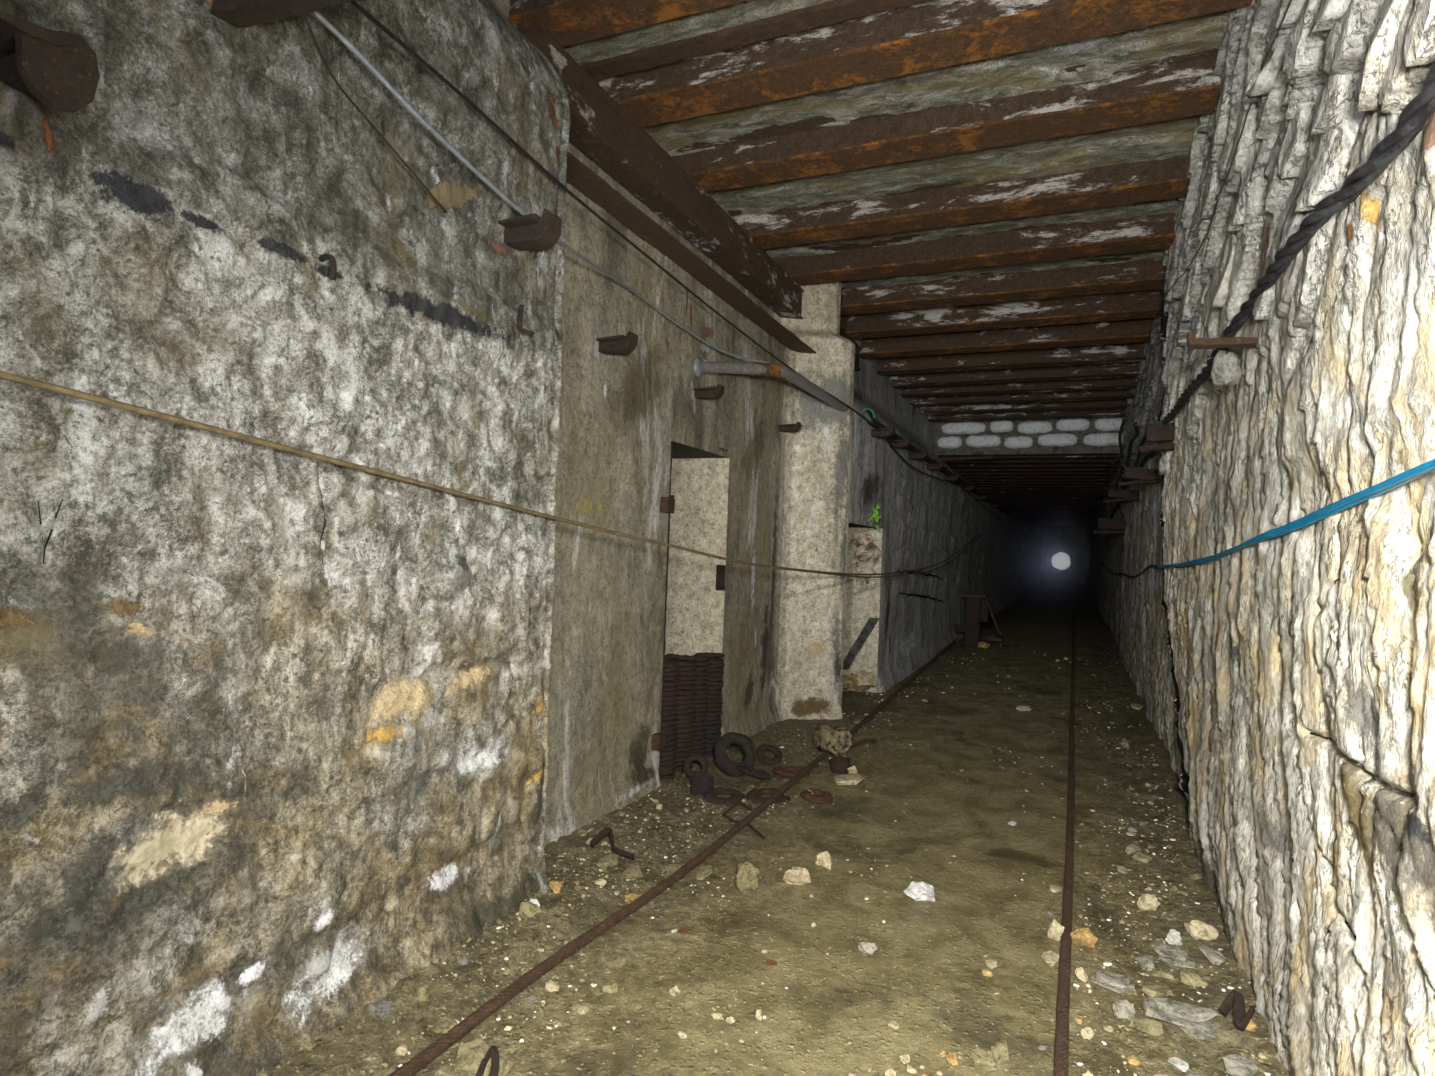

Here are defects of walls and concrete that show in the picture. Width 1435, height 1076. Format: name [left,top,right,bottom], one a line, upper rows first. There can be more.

rust [546,92,560,162]
crack [1158,285,1190,827]
crack [1309,732,1418,798]